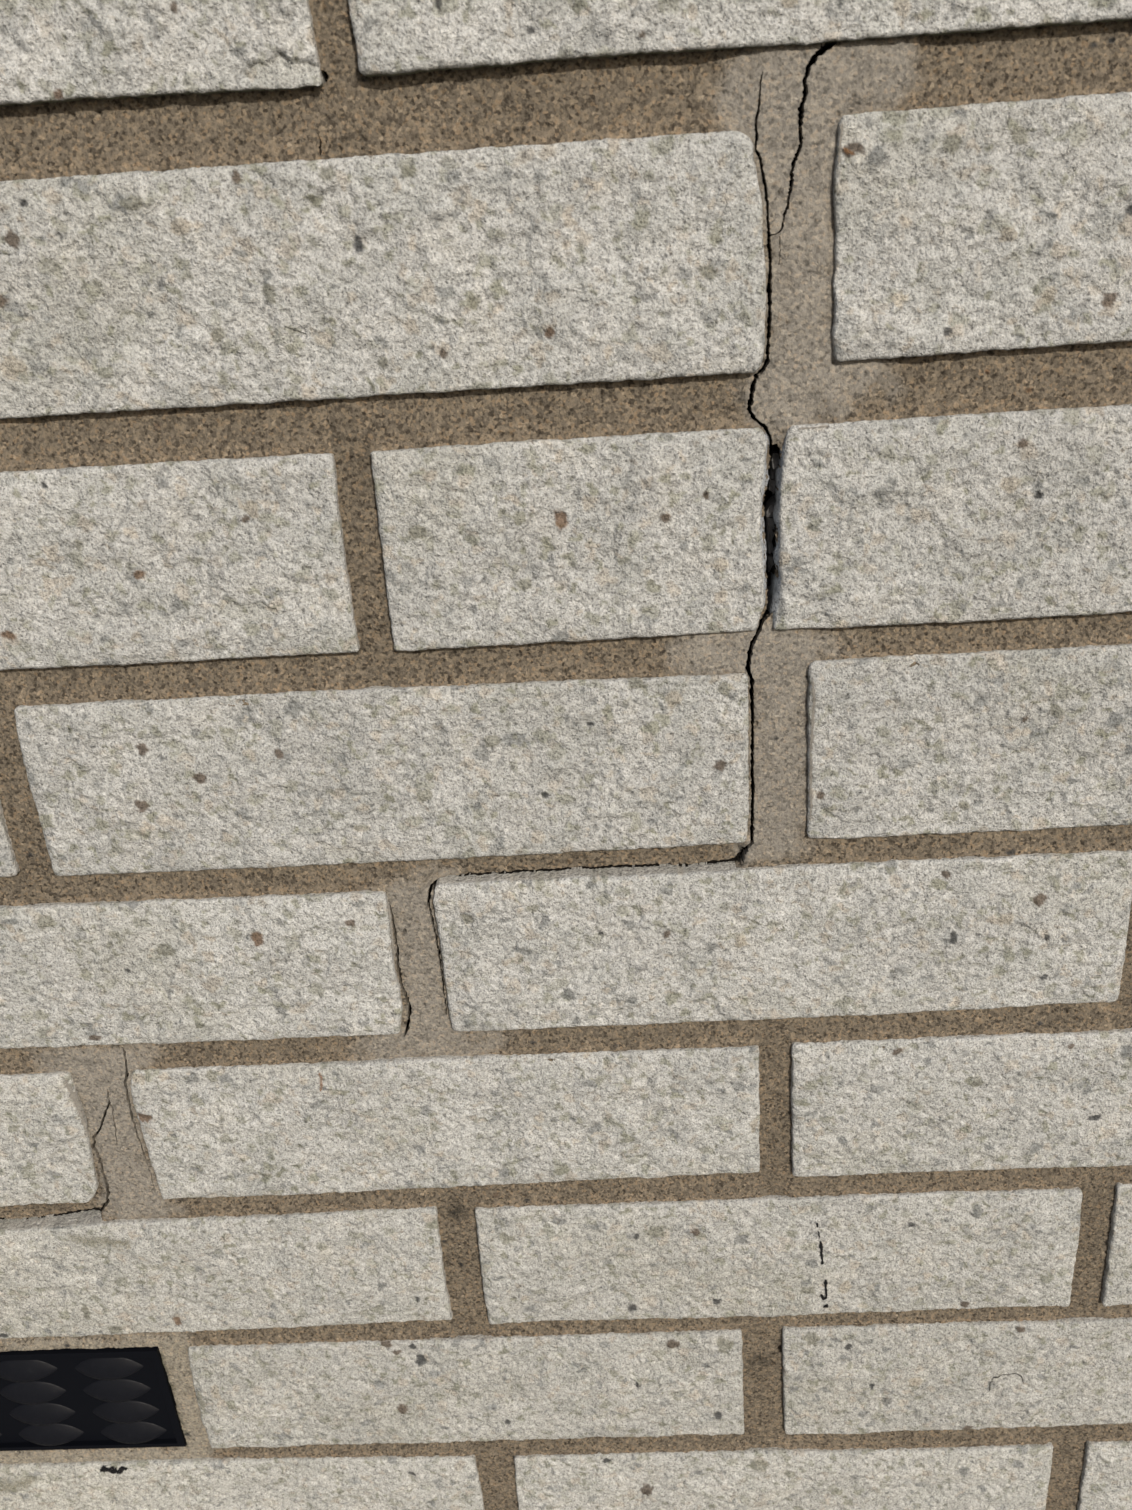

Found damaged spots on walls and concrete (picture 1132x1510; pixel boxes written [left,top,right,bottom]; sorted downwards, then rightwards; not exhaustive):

crack [396,43,830,1030]
crack [0,1191,110,1220]